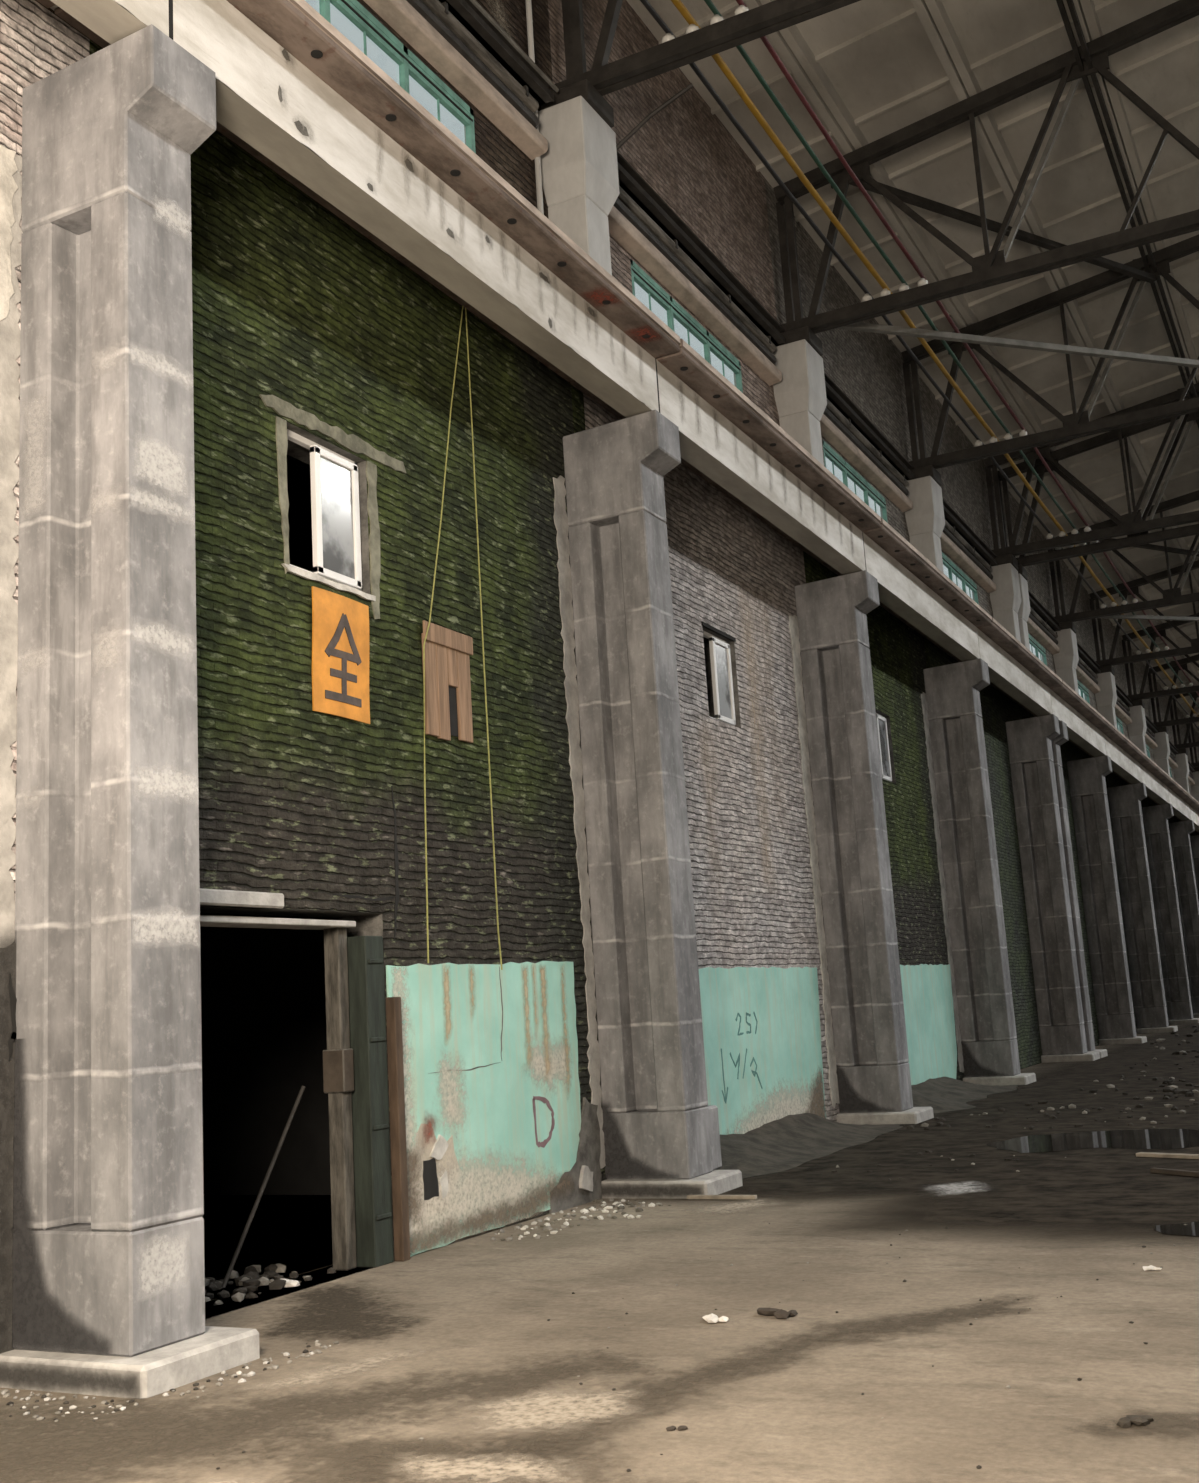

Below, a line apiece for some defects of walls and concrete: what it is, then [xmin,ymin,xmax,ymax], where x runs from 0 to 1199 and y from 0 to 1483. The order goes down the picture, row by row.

peeling [393,475,606,1252]